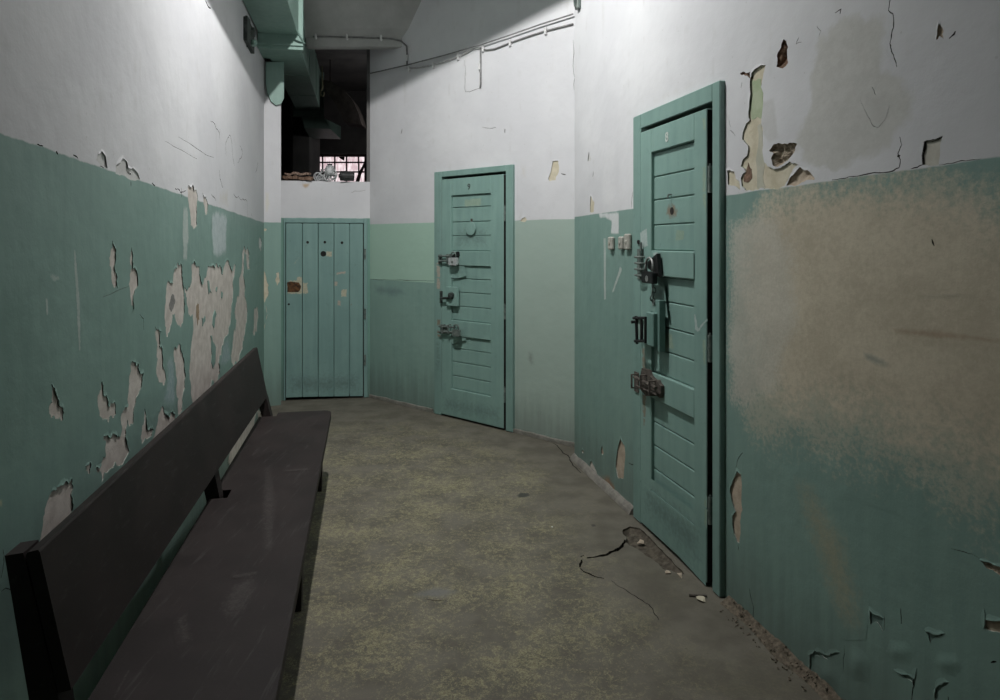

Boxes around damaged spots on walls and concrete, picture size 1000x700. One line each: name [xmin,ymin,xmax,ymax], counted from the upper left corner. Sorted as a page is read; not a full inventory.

crack [888,1,897,67]
peeling [96,149,140,181]
peeling [548,159,559,181]
peeling [188,183,208,228]
corrosion [287,282,301,292]
peeling [725,39,1000,584]
peeling [85,228,308,481]
peeling [615,436,625,479]
peeling [40,477,74,541]
crack [579,540,659,620]
peeling [981,609,1000,633]